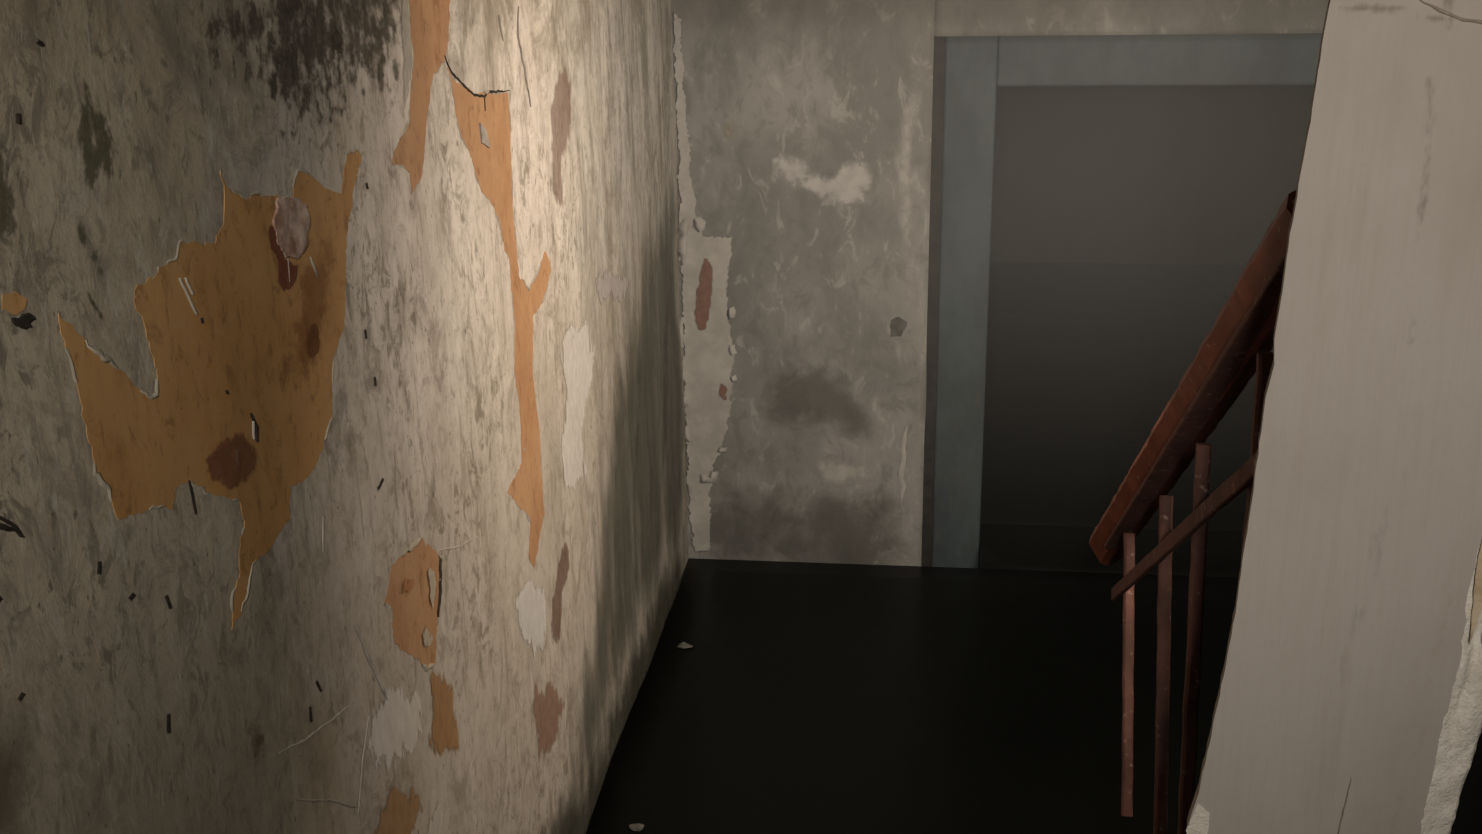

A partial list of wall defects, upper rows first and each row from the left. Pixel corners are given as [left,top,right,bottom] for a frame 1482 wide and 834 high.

leakage [207,0,402,136]
peeling [58,148,369,629]
peeling [392,0,569,658]
flaking render [561,321,595,489]
crack [0,516,23,537]
peeling [368,537,459,770]
peeling [374,786,423,834]